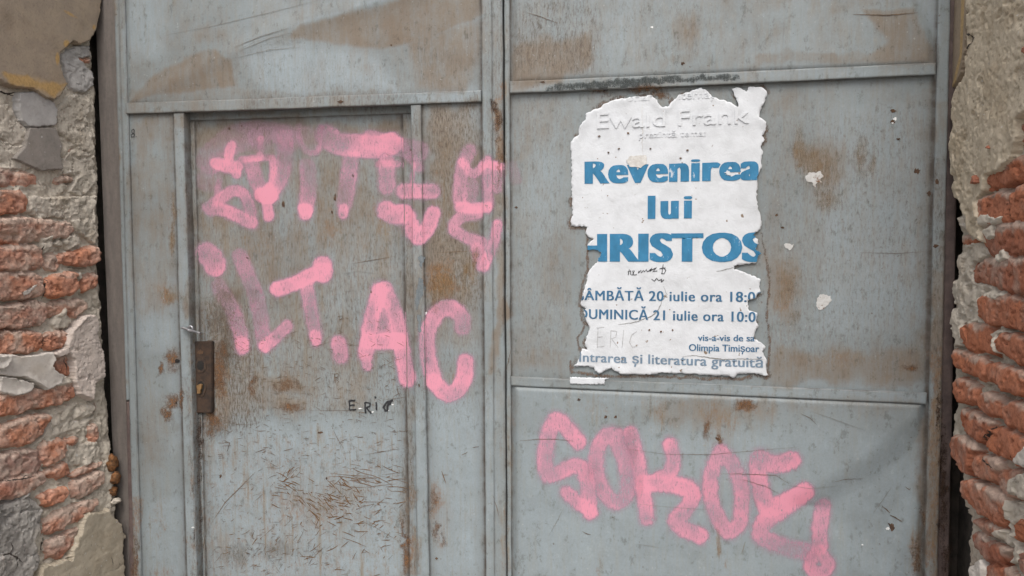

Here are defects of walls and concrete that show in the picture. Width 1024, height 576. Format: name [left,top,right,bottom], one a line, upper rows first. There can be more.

flaking render [0,0,101,100]
flaking render [0,314,106,467]
corrosion [158,350,179,373]
corrosion [160,390,184,420]
flaking render [33,507,126,576]